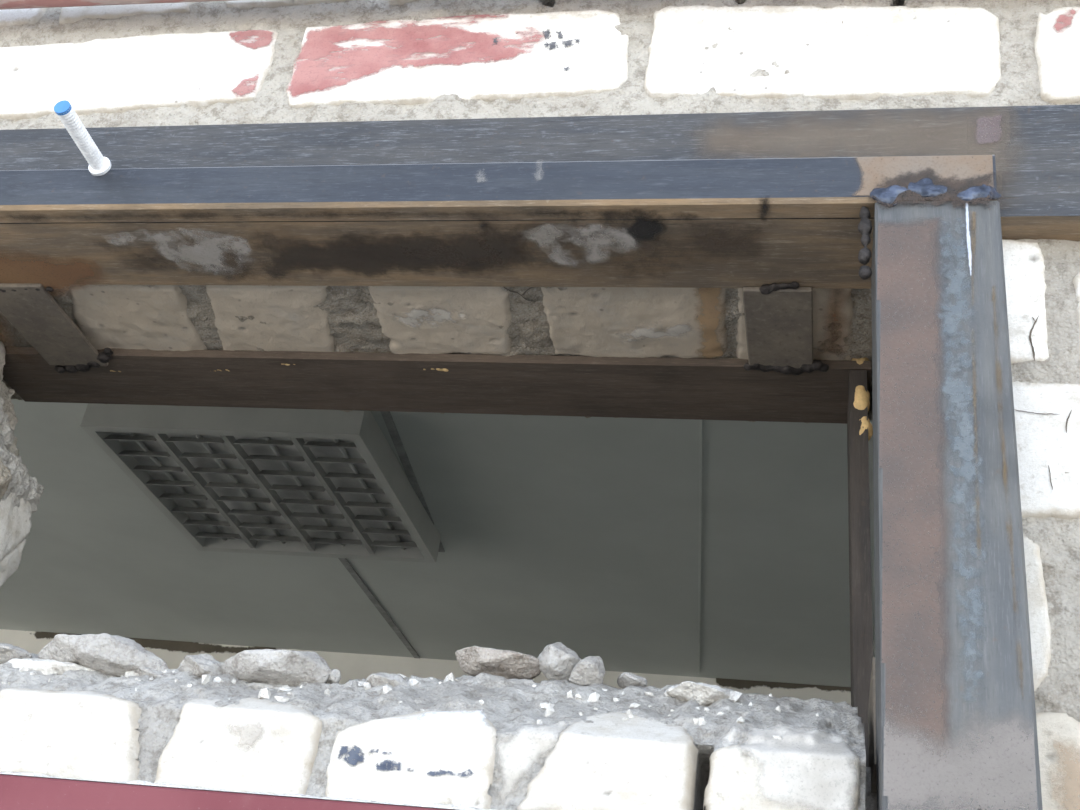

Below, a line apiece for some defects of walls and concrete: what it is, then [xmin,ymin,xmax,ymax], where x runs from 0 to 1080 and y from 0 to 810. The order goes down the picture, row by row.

rust [877,220,948,753]